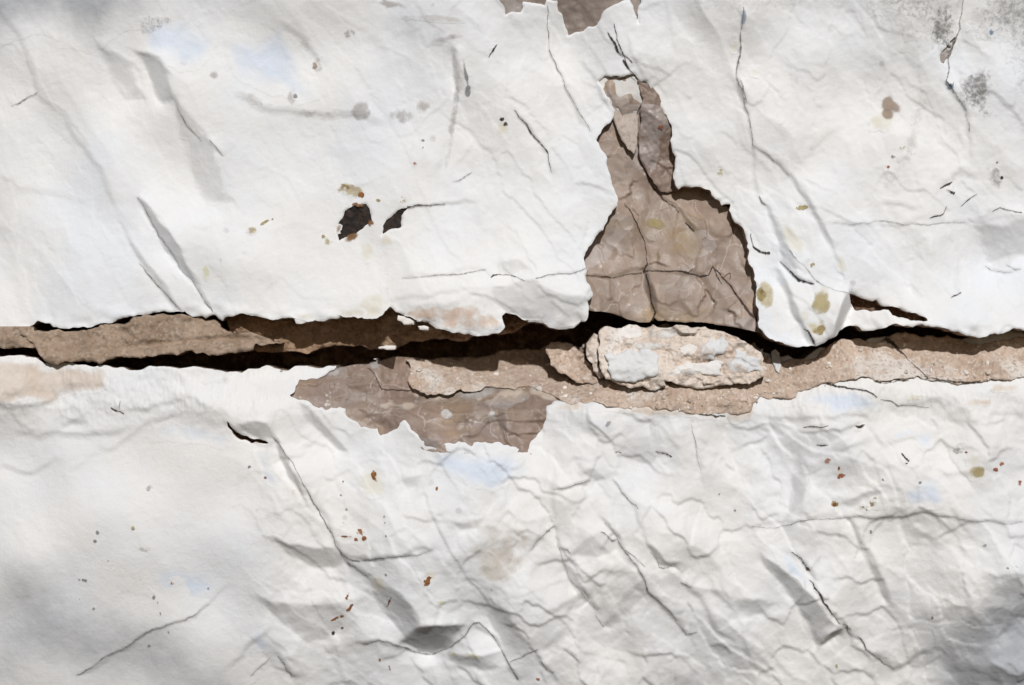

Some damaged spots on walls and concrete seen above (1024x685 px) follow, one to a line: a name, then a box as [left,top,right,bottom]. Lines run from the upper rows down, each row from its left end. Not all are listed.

crack [736,9,789,175]
spalling [338,204,407,240]
spalling [491,77,781,383]
crack [0,348,39,356]
peeling [397,315,430,331]
spalling [291,345,560,454]
crack [88,197,981,408]
spalling [613,422,663,468]